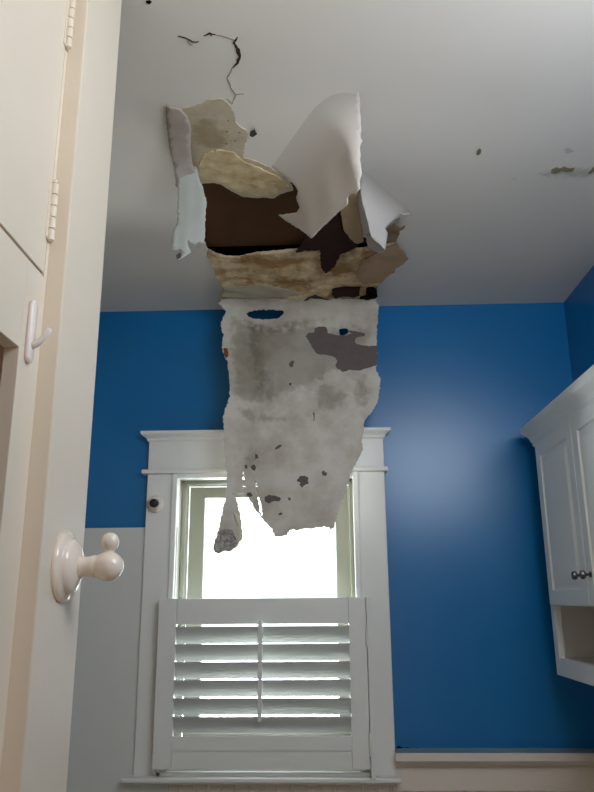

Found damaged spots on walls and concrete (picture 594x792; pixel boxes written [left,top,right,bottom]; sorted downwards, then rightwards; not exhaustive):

crack [178,32,241,104]
peeling [182,93,411,253]
peeling [551,166,575,174]
spalling [207,245,300,256]
peeling [306,327,378,372]